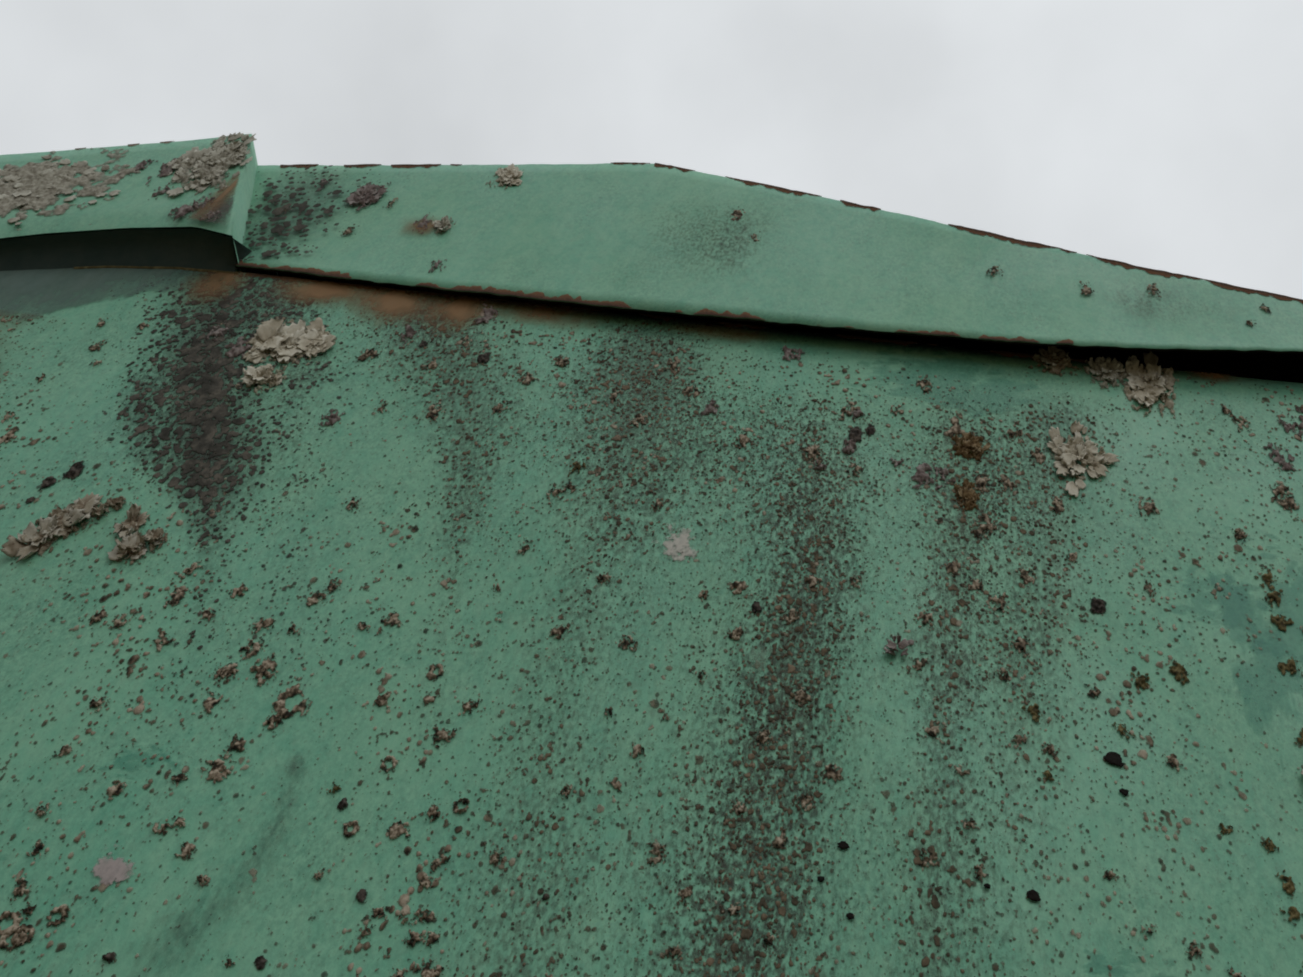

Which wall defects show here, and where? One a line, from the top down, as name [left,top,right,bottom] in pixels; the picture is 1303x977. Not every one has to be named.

leakage [239,165,387,261]
corrosion [613,162,695,172]
corrosion [725,176,822,197]
corrosion [840,200,881,211]
corrosion [196,261,631,324]
corrosion [676,308,778,322]
corrosion [948,224,1303,303]
leakage [0,268,1302,977]